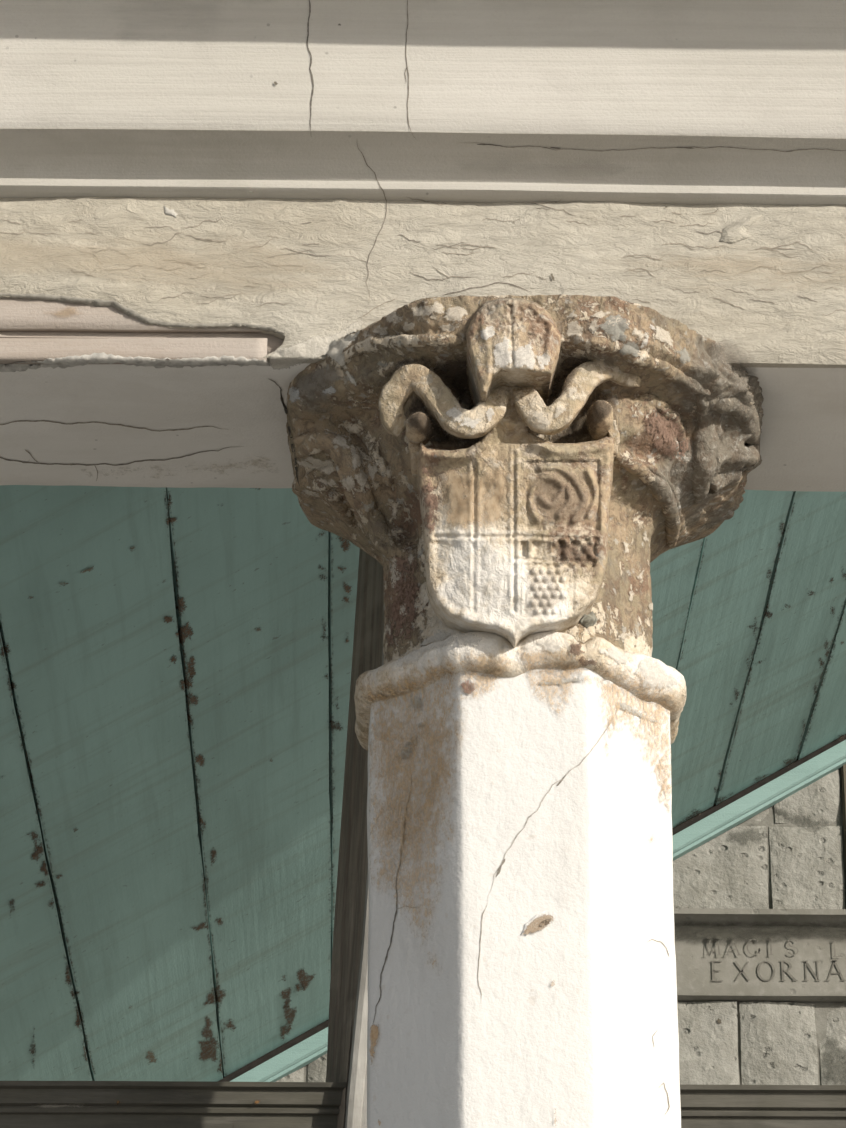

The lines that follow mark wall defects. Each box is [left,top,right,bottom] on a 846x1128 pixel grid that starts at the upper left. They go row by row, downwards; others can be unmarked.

crack [306,0,314,131]
peeling [0,293,284,334]
crack [0,145,591,319]
crack [620,208,846,331]
peeling [0,352,270,372]
crack [0,420,243,481]
peeling [164,597,194,644]
peeling [170,656,198,725]
crack [478,710,617,997]
crack [343,776,417,1128]
spalling [521,912,553,935]
peeling [199,985,235,1075]